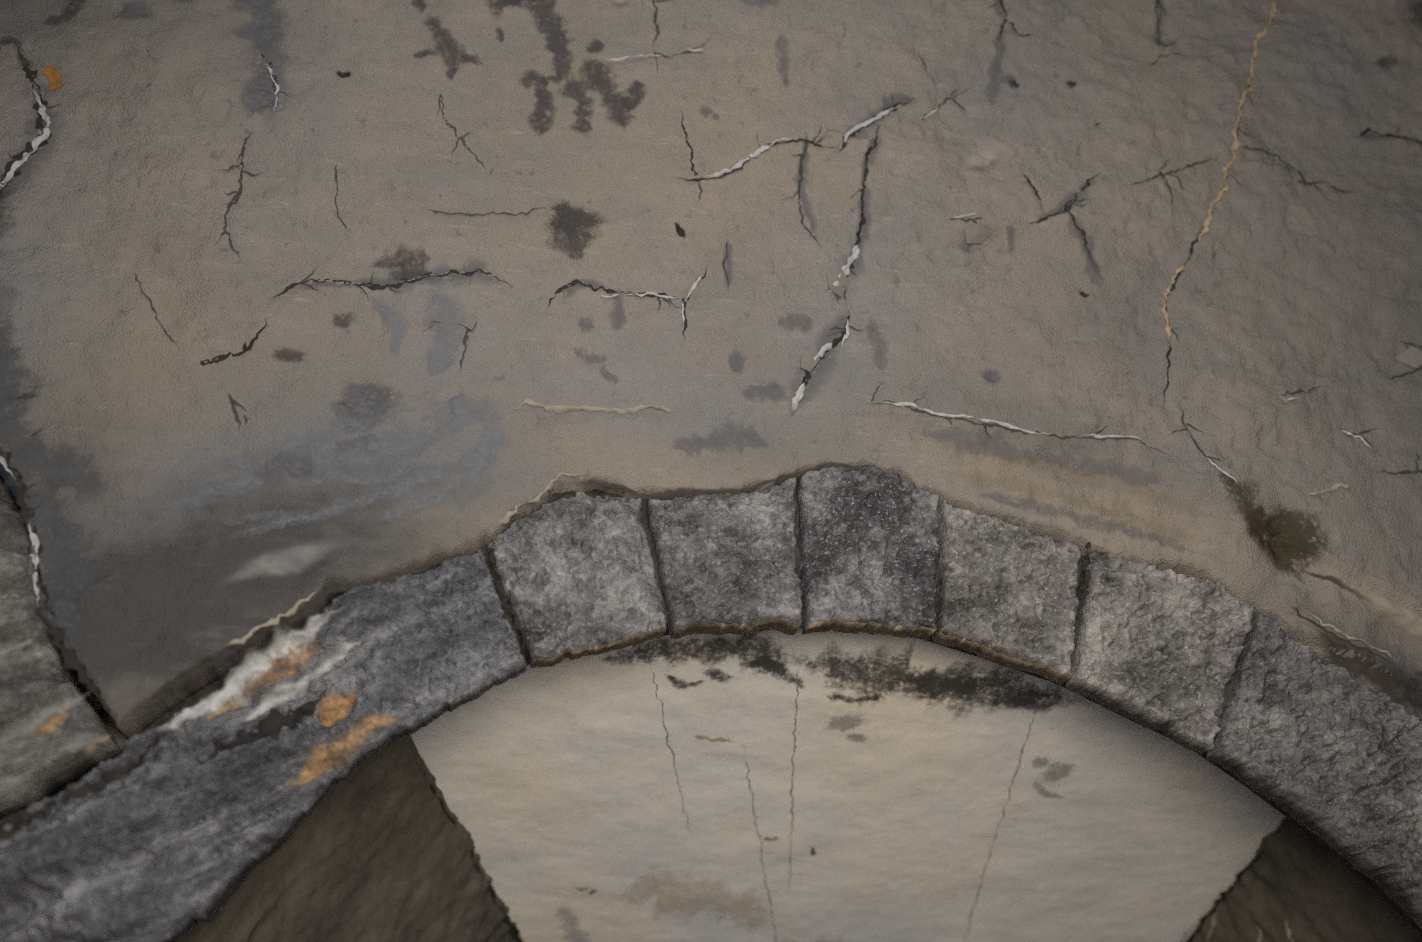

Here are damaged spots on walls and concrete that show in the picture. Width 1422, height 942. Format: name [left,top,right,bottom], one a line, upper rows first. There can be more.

crack [0,47,61,198]
leakage [414,0,476,78]
leakage [490,0,644,132]
crack [135,268,504,428]
crack [548,243,731,337]
crack [677,55,967,410]
crack [871,0,1349,485]
leakage [1222,475,1324,573]
corrosion [206,643,316,720]
peeling [160,560,441,691]
corrosion [290,694,394,785]
leakage [606,633,1068,741]